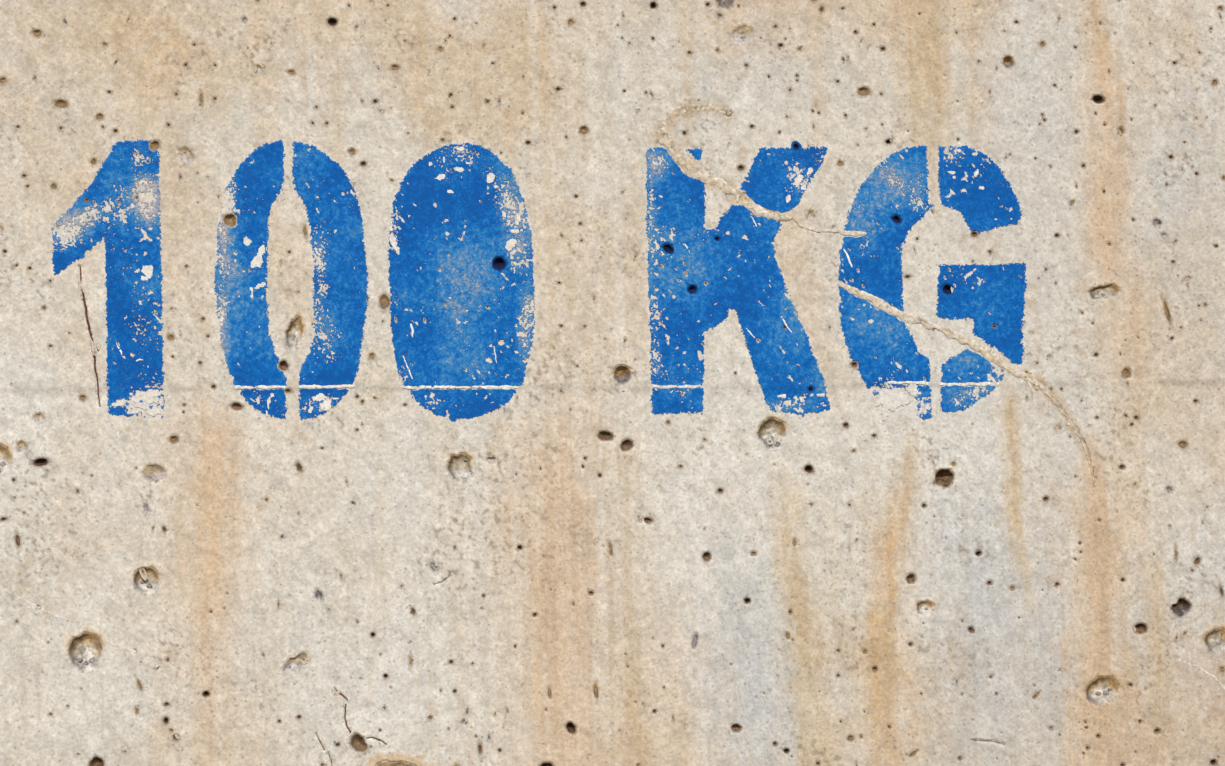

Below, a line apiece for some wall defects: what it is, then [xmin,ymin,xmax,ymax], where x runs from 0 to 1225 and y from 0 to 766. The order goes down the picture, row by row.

crack [641,92,865,237]
crack [76,266,103,407]
crack [837,282,1096,486]